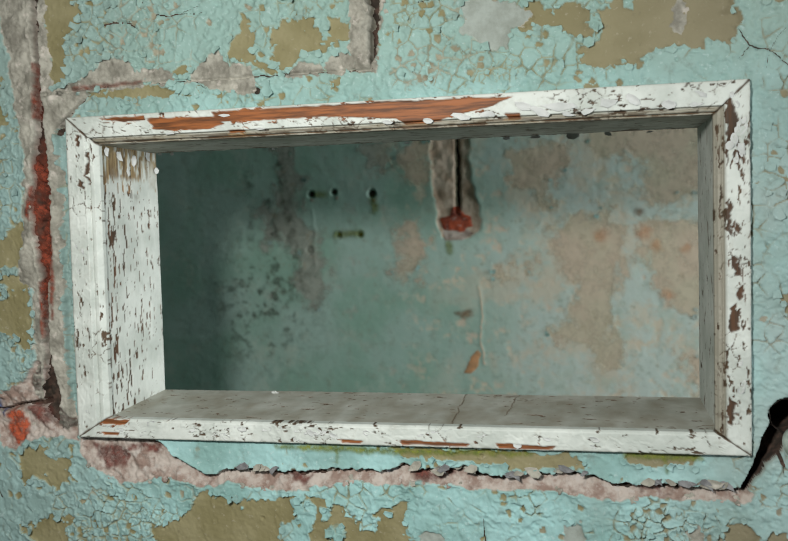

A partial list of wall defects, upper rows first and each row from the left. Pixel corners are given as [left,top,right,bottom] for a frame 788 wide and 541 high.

peeling [44,0,355,105]
peeling [387,0,743,93]
corrosion [32,64,44,121]
peeling [450,111,495,120]
peeling [529,98,618,117]
peeling [661,99,676,109]
peeling [566,128,698,206]
peeling [757,94,788,221]
corrosion [25,154,54,335]
spalling [0,216,788,541]
crack [741,423,785,488]